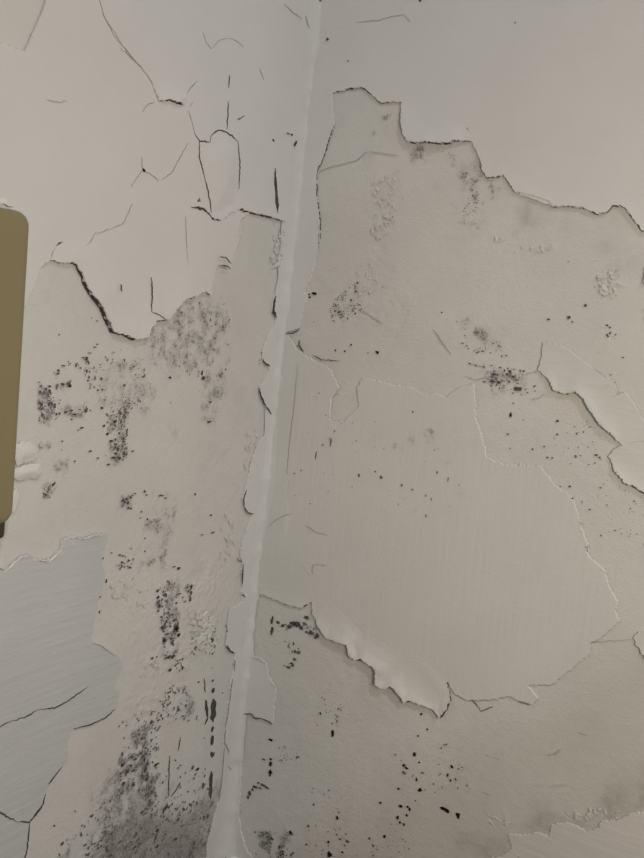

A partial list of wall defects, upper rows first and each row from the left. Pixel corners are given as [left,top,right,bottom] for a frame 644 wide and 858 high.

crack [87,0,196,245]
crack [272,168,280,213]
damp [38,349,147,465]
damp [457,321,536,417]
peeling [239,87,644,858]
peeling [0,195,290,858]
damp [151,580,194,672]
damp [270,616,319,639]
damp [59,678,223,858]
damp [247,738,300,799]
damp [255,830,294,858]
damp [368,752,468,857]